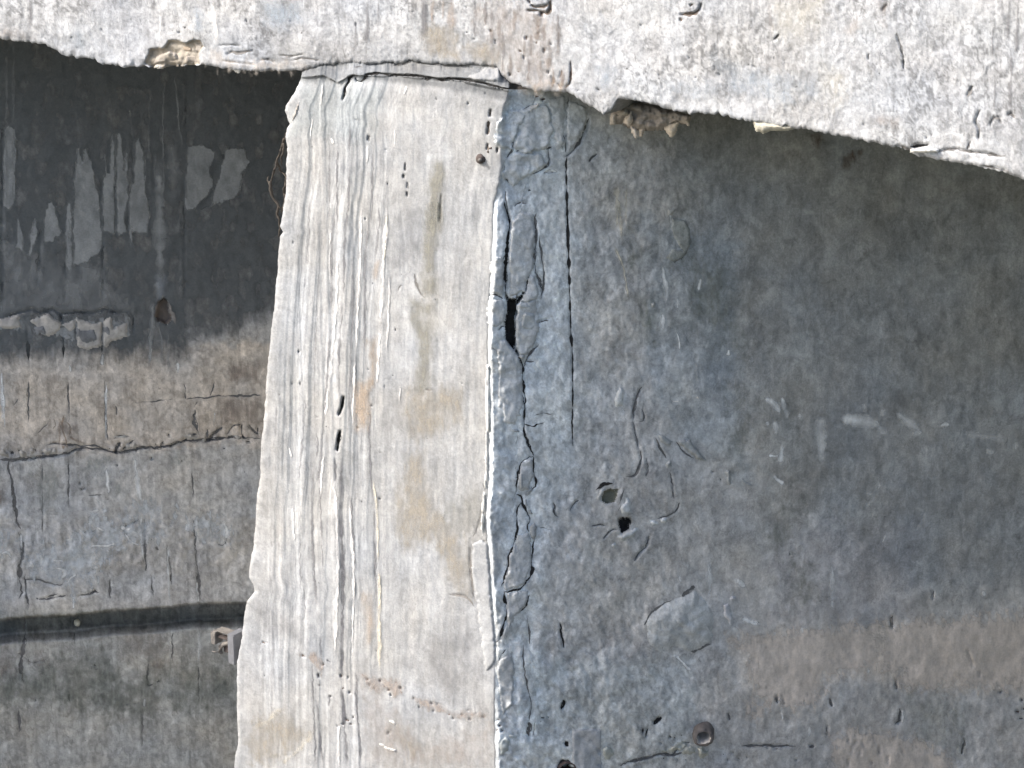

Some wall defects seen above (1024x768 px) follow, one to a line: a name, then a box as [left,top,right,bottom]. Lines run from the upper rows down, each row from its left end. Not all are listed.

spalling [145,27,204,68]
spalling [610,102,691,139]
leakage [0,39,302,371]
peeling [0,314,128,350]
crack [342,60,597,736]